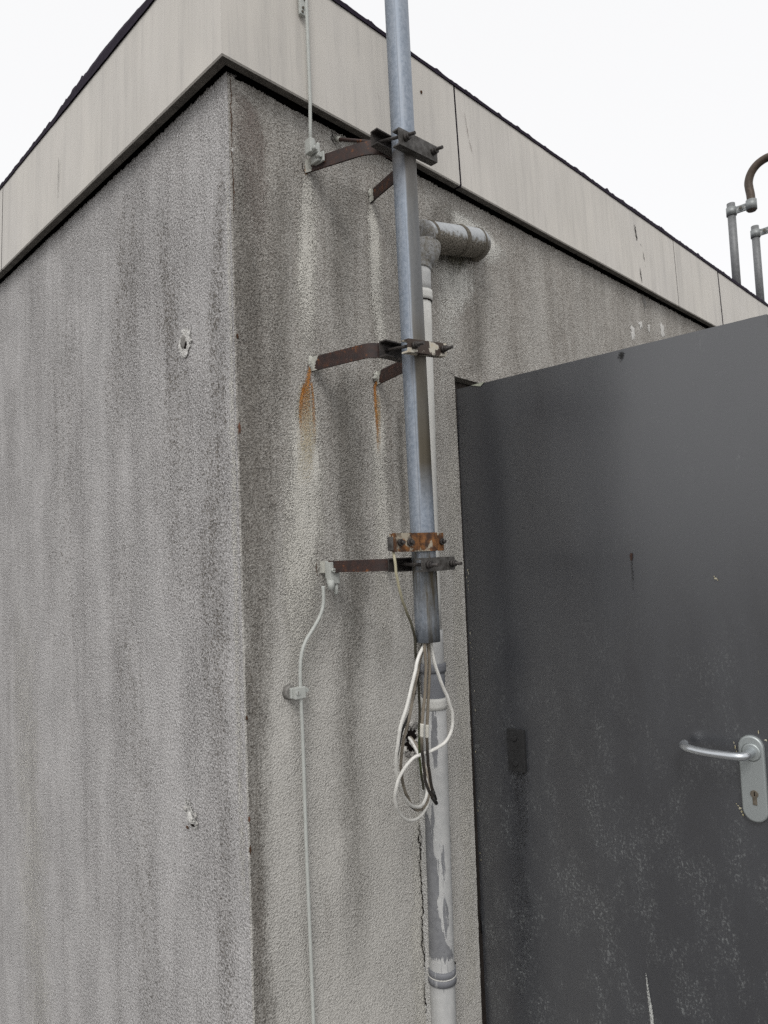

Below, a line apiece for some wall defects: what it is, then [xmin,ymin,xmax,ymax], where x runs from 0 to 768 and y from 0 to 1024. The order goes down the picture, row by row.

rust [297,367,316,478]
rust [373,381,381,443]
crack [418,825,427,1013]